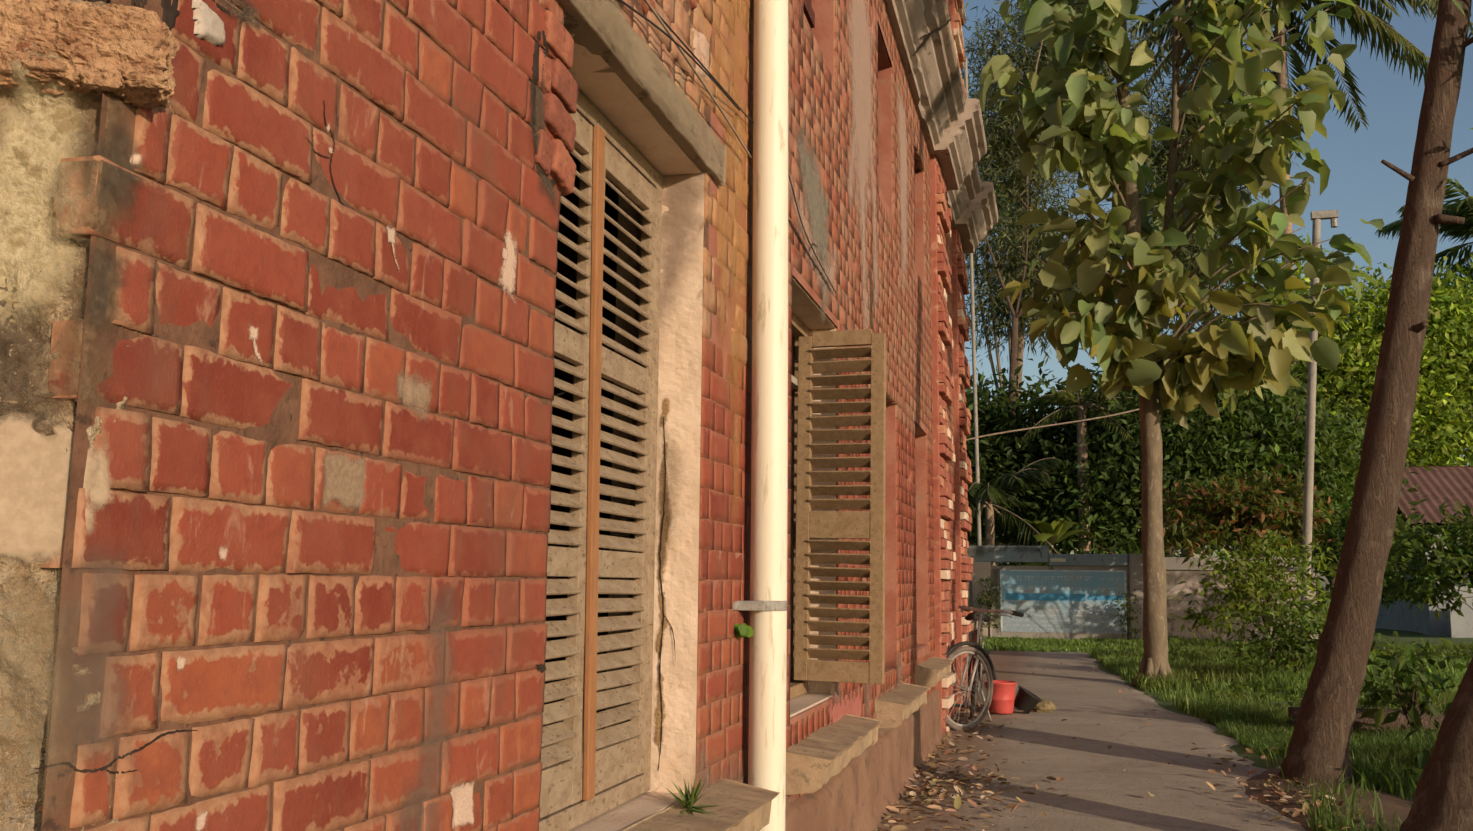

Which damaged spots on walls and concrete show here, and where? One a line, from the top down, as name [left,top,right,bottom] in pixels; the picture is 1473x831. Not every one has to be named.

spalling [0,0,179,109]
peeling [690,0,709,83]
flaking render [0,415,112,563]
crack [658,417,675,770]